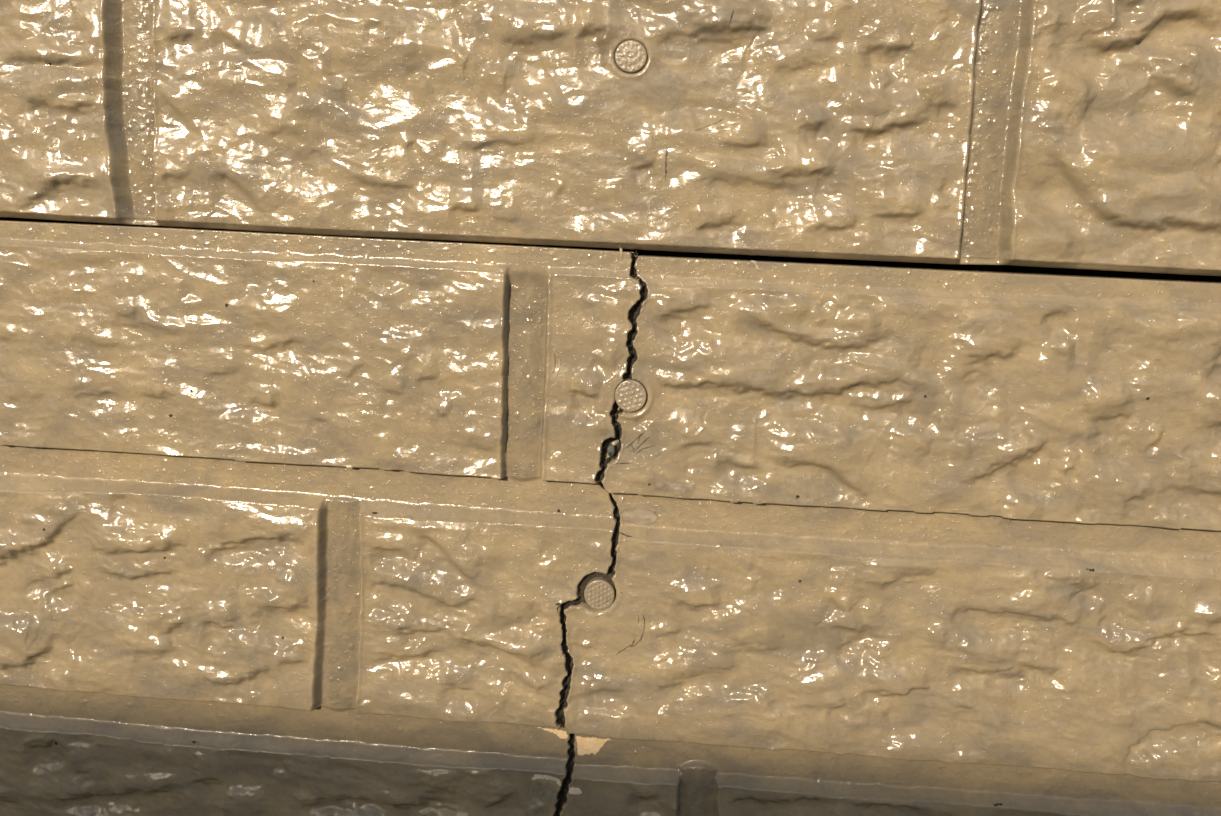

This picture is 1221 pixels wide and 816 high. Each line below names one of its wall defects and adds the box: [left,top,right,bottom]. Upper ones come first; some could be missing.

crack [554,249,650,816]